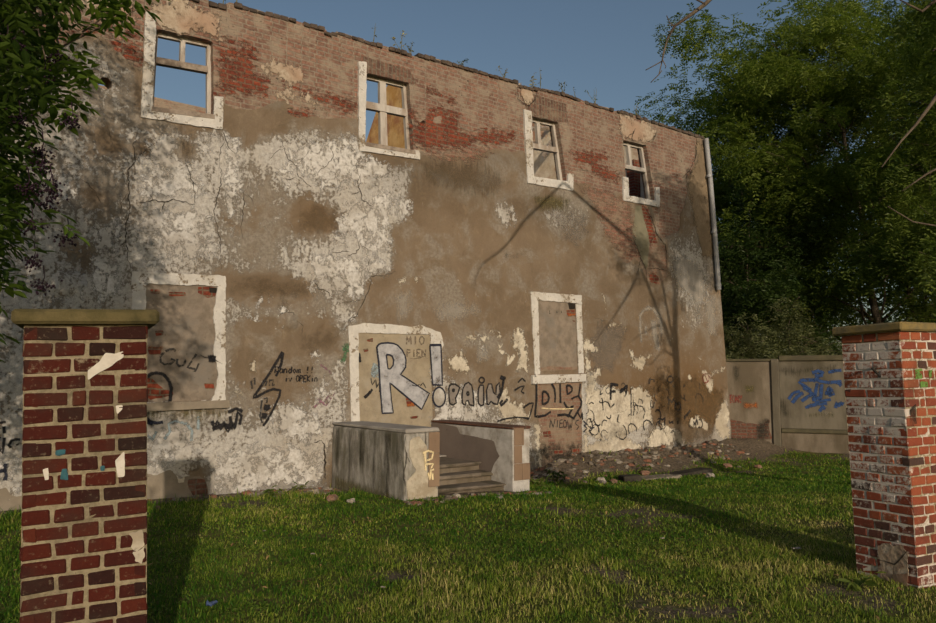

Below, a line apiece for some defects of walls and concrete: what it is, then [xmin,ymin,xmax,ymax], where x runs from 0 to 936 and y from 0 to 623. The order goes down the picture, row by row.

flaking render [213,36,357,118]
flaking render [408,88,515,151]
crack [84,131,253,271]
crack [269,142,371,206]
flaking render [569,149,668,284]
flaking render [688,141,714,258]
crack [315,244,395,322]
spalling [0,456,22,511]